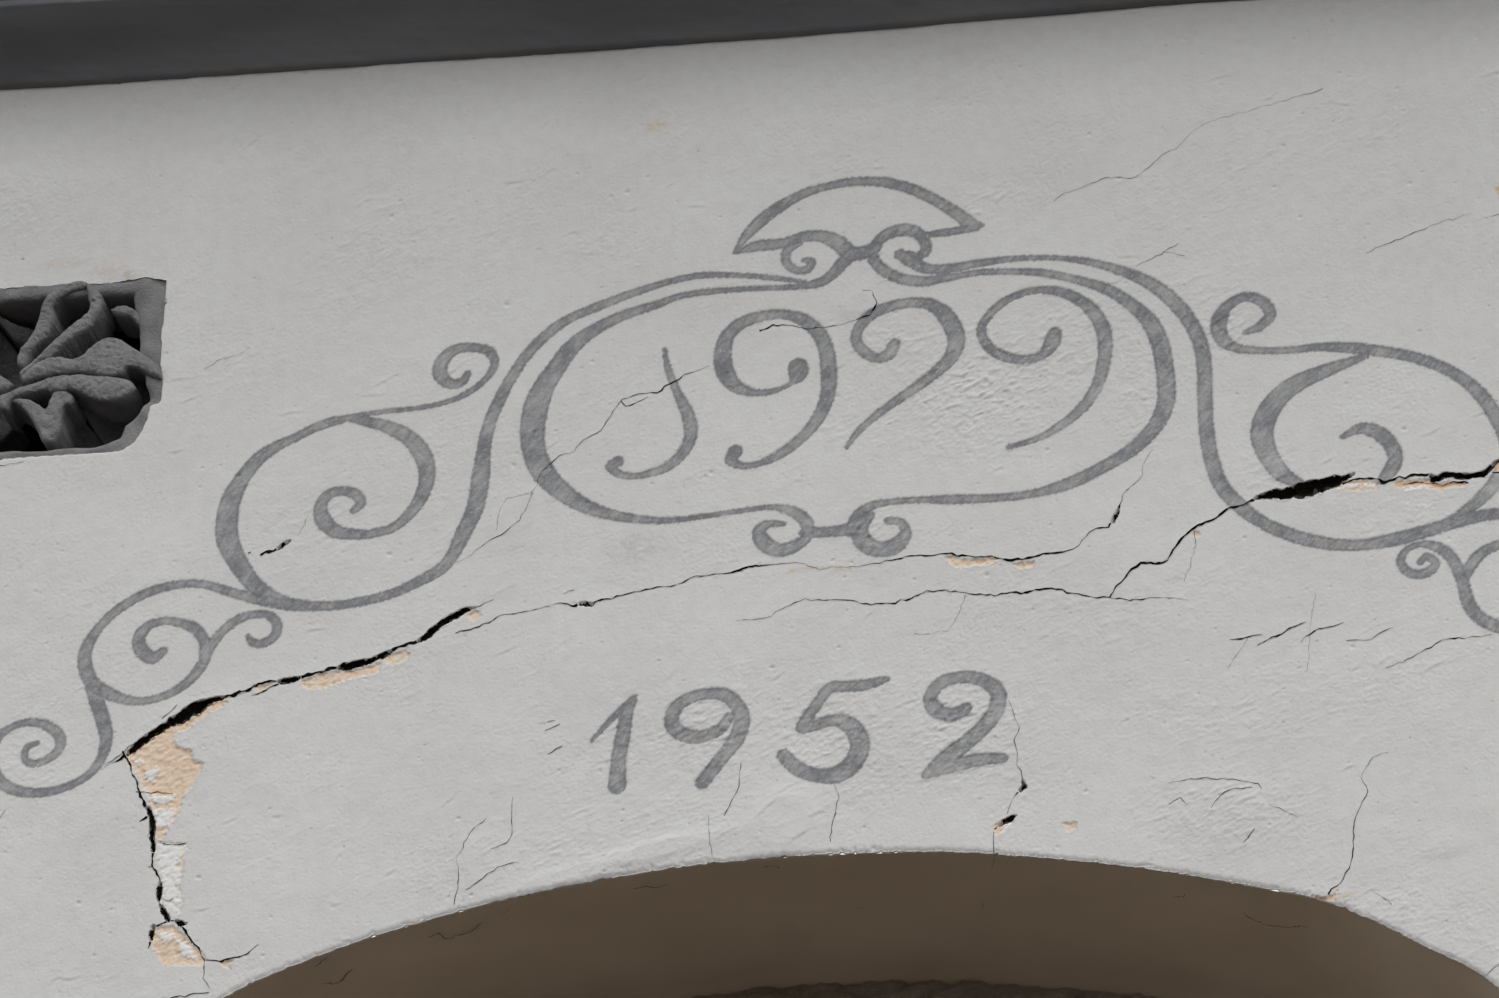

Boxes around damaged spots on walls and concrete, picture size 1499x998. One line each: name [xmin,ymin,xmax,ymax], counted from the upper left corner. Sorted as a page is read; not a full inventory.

crack [759,280,888,331]
crack [458,367,705,562]
flaking render [1334,477,1467,494]
flaking render [298,648,411,692]
crack [101,453,1499,998]
flaking render [124,699,235,970]